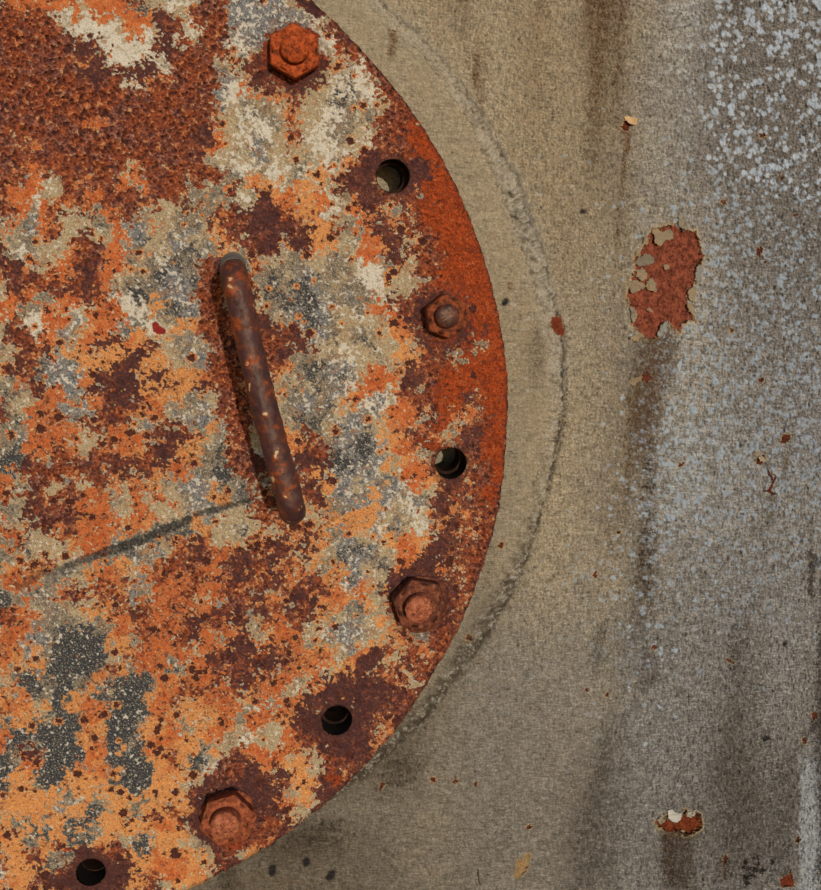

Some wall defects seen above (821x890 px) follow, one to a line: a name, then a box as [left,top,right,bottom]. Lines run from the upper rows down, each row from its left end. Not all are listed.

corrosion [0,0,229,216]
peeling [620,116,638,130]
corrosion [233,190,313,257]
peeling [627,216,704,342]
corrosion [257,310,304,373]
corrosion [331,81,508,648]
corrosion [16,440,142,545]
corrosion [292,439,334,478]
corrosion [289,668,400,796]
corrosion [40,845,136,890]
corrosion [165,746,289,878]
peeling [656,809,702,837]